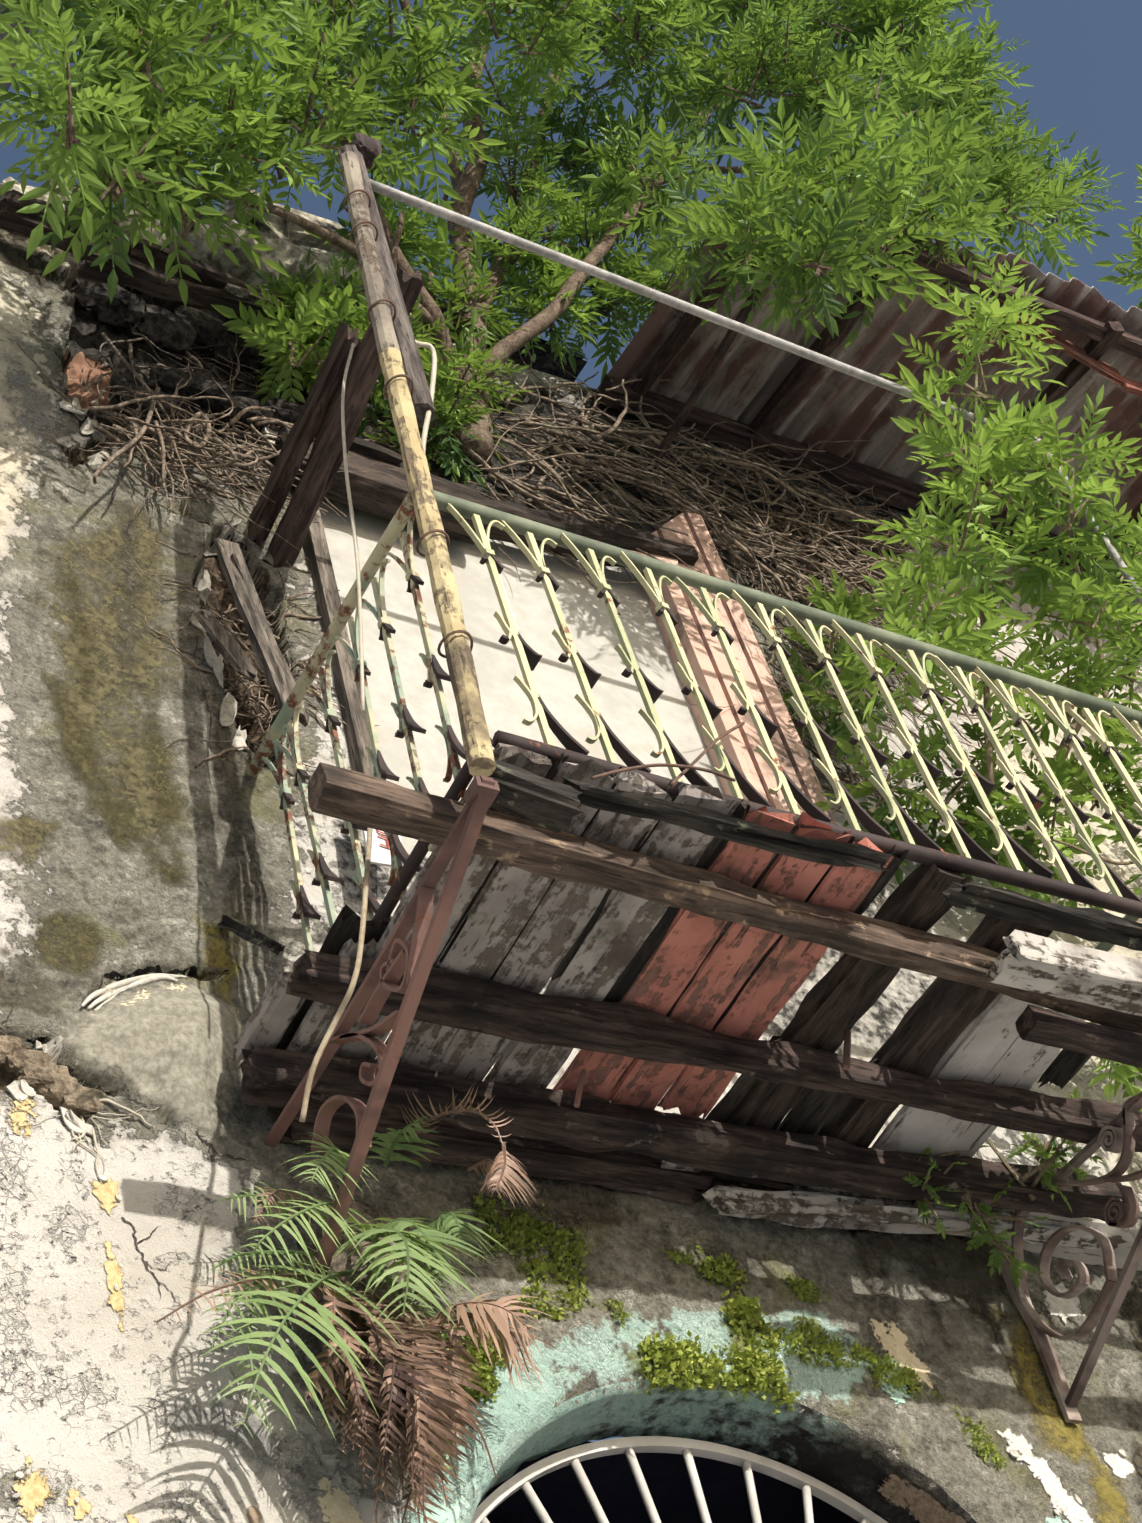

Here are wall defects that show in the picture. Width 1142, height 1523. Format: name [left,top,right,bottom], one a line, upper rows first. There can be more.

water stain [30,482,190,883]
peeling [81,973,226,1012]
flaking render [0,1035,107,1140]
crack [121,1217,176,1302]
peeling [1043,1282,1086,1325]
water stain [1117,1274,1142,1352]
peeling [867,1318,934,1404]
peeling [11,1455,97,1523]
flaking render [878,1464,967,1523]
peeling [995,1428,1096,1523]
peeling [1102,1449,1134,1478]
water stain [1133,1445,1142,1504]